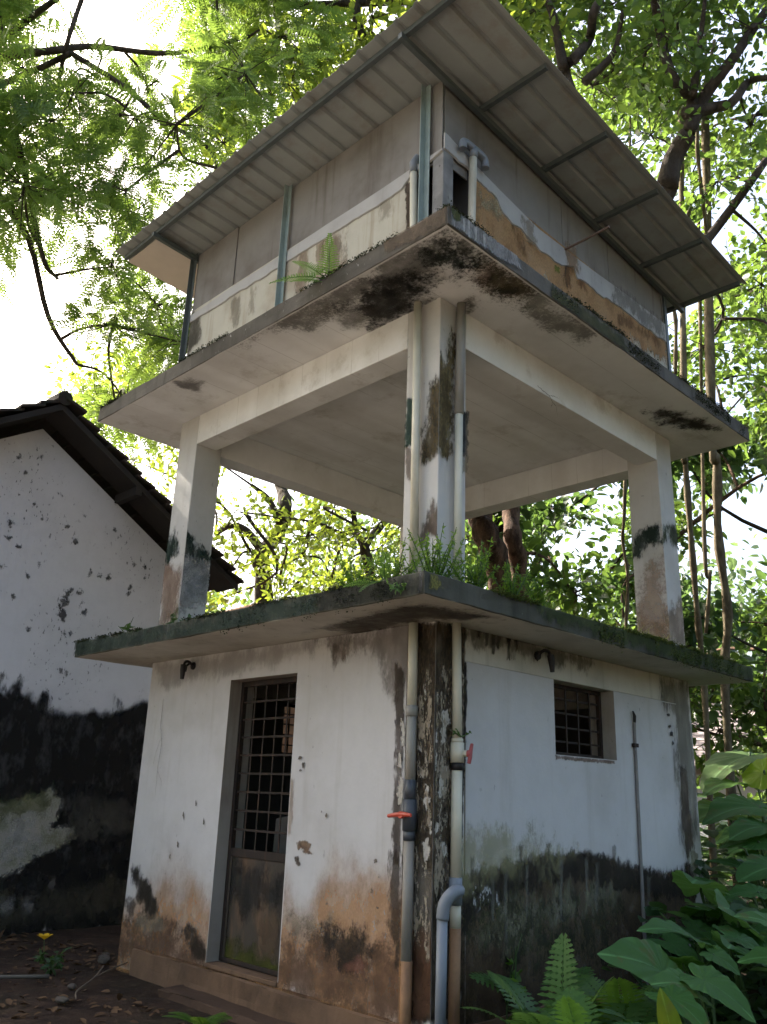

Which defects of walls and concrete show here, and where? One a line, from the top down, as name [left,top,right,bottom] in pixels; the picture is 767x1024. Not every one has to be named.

damp [268,211,596,340]
damp [642,409,722,431]
damp [0,674,157,937]
damp [181,924,206,960]
peeling [396,665,464,960]
damp [321,606,698,1024]